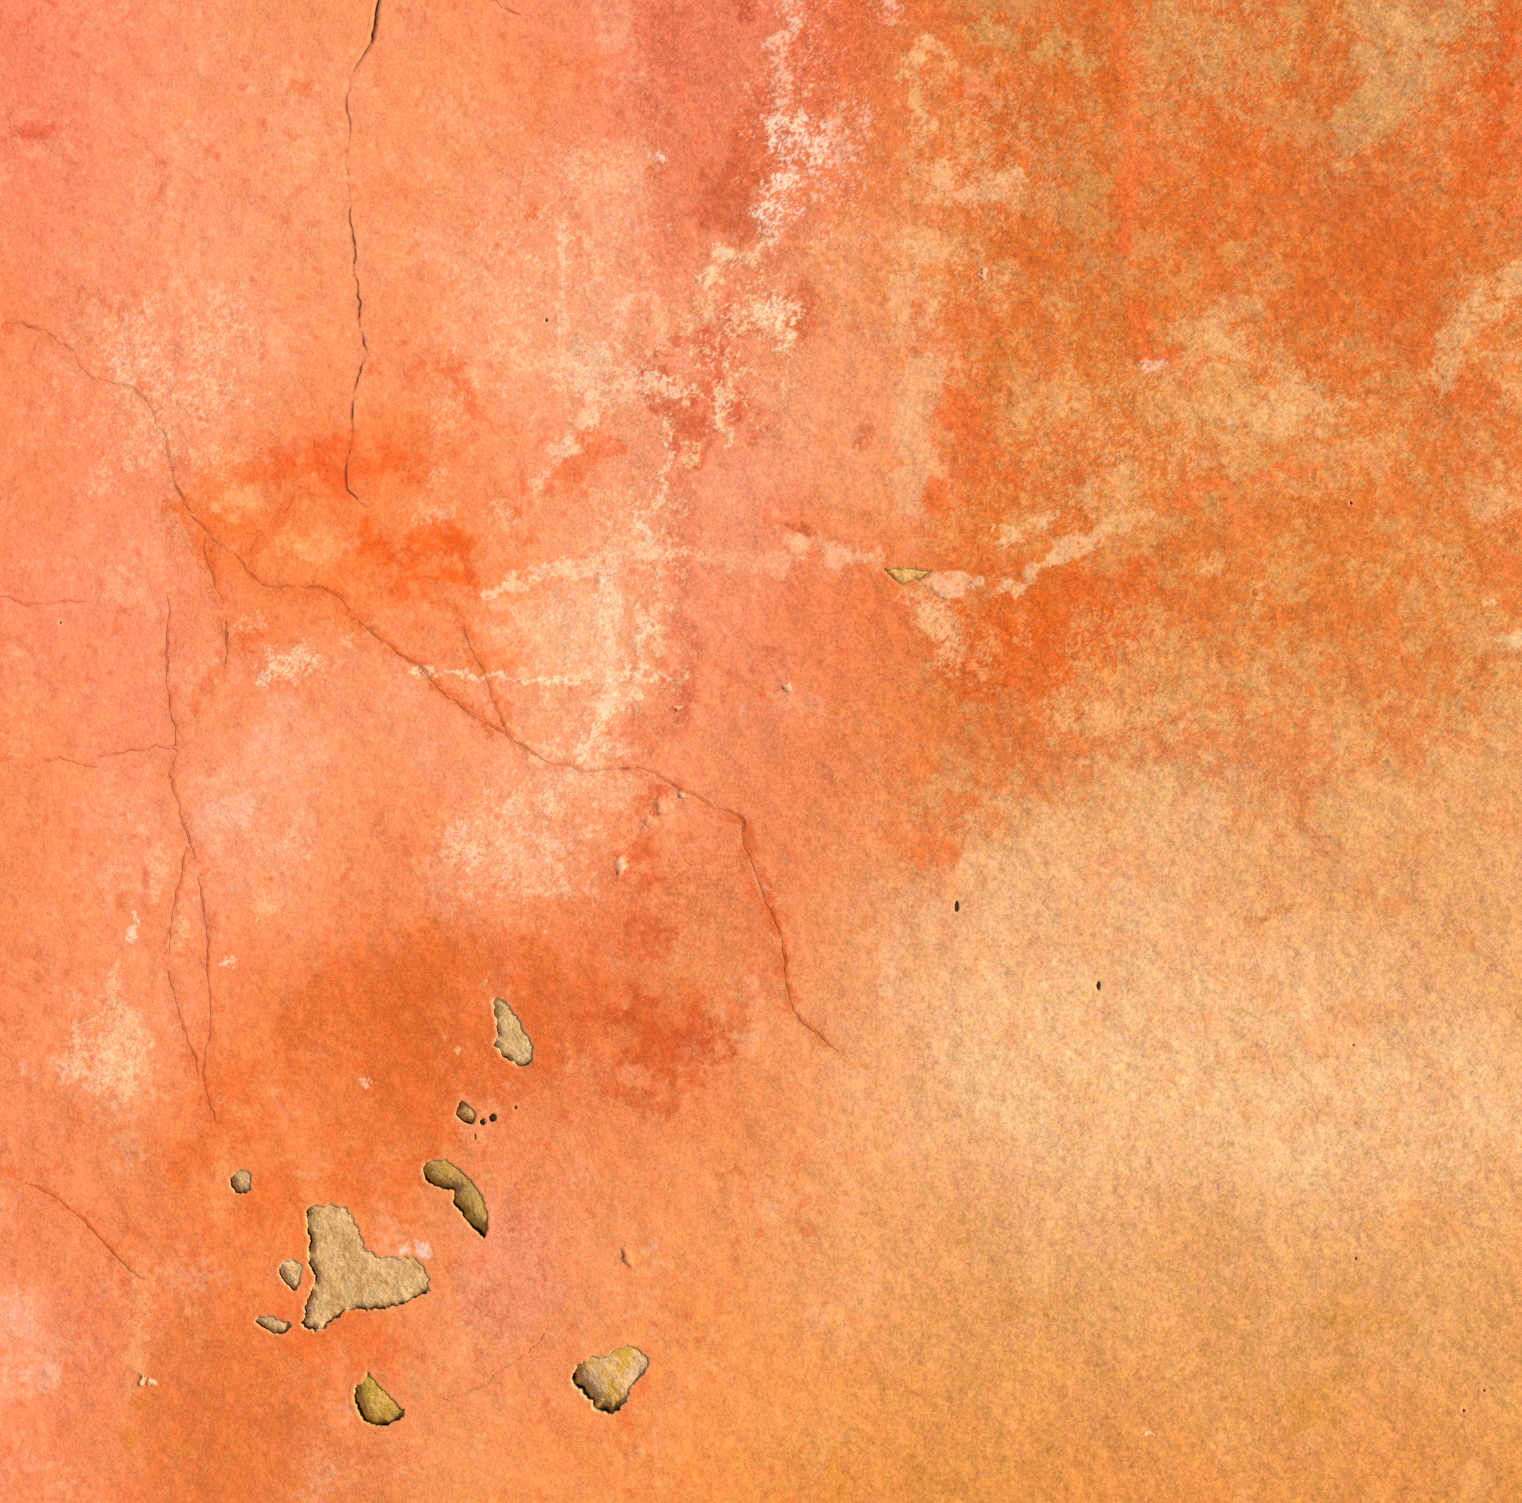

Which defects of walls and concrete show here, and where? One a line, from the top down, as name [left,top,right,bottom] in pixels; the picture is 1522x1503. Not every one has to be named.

crack [496,0,531,15]
crack [345,0,383,508]
leakage [1196,547,1228,579]
crack [0,311,849,1124]
leakage [0,0,984,1391]
leakage [859,565,1522,1258]
spalling [488,993,538,1071]
spalling [451,1096,521,1144]
spalling [417,1154,493,1243]
spalling [250,1198,435,1339]
spalling [348,1367,409,1431]
spalling [566,1340,654,1419]